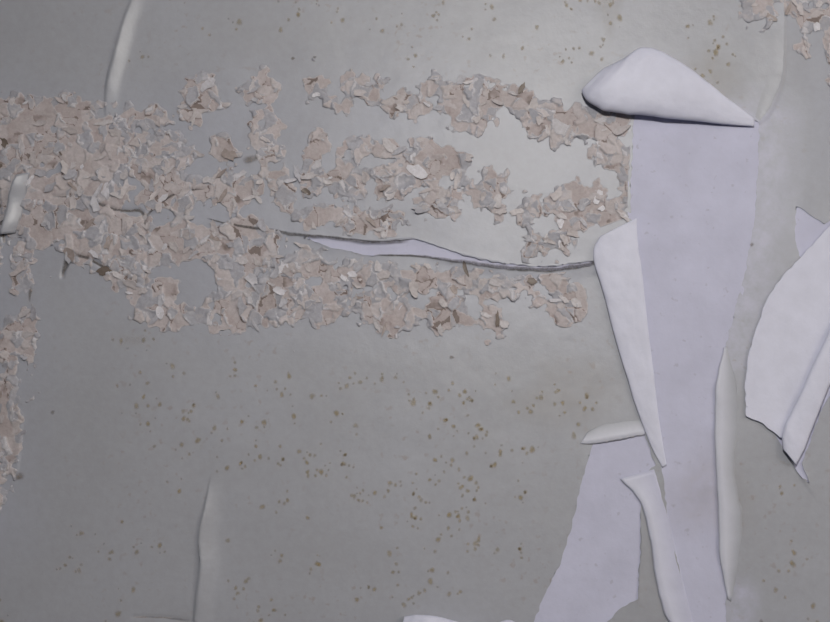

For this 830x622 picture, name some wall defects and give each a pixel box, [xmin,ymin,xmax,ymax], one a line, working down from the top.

peeling [0,303,41,512]
peeling [0,0,588,340]
crack [213,220,593,272]
peeling [302,0,830,622]
peeling [194,478,238,622]